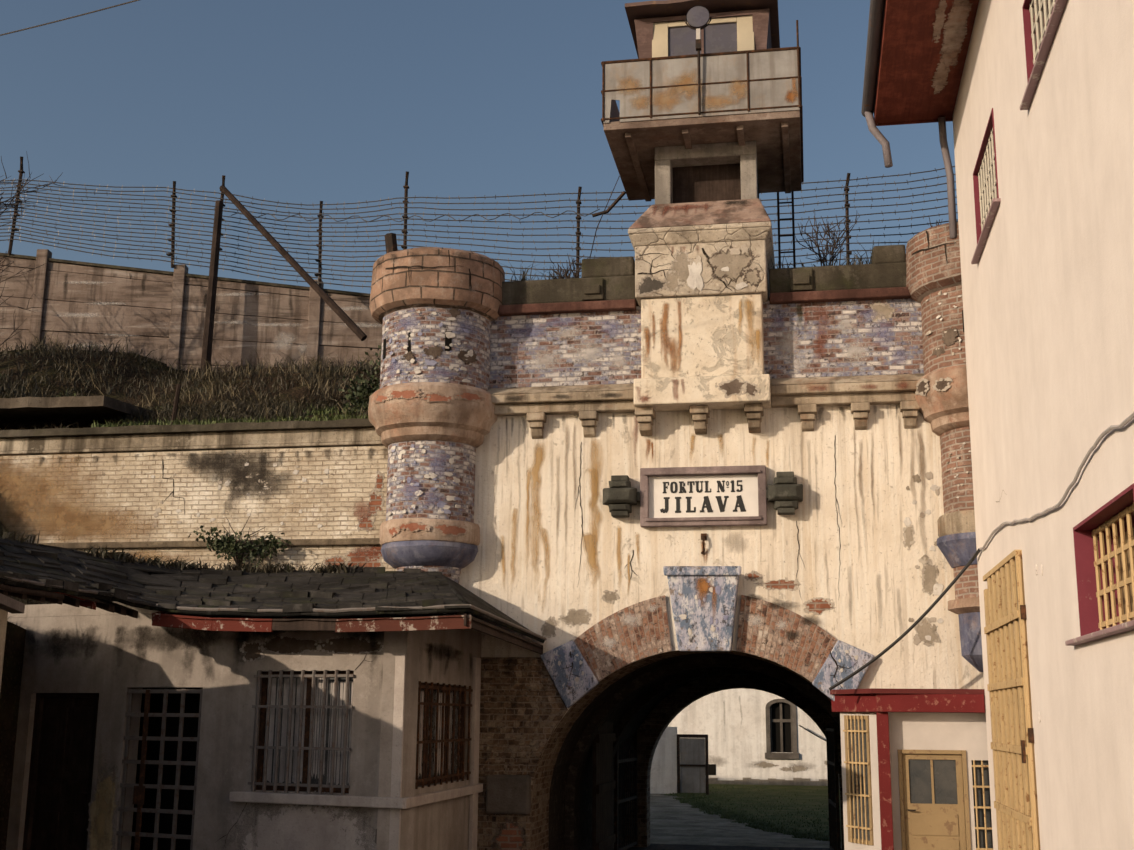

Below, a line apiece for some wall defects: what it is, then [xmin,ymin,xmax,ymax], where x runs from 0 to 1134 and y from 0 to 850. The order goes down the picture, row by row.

peeling [931,0,974,94]
corrosion [622,74,746,108]
crack [637,253,670,278]
spalling [637,243,761,296]
crack [702,248,752,291]
spalling [715,378,760,398]
damp [189,452,282,496]
damp [0,457,145,538]
corrosion [584,444,600,576]
spalling [903,442,971,596]
damp [27,631,94,655]
damp [137,627,220,668]